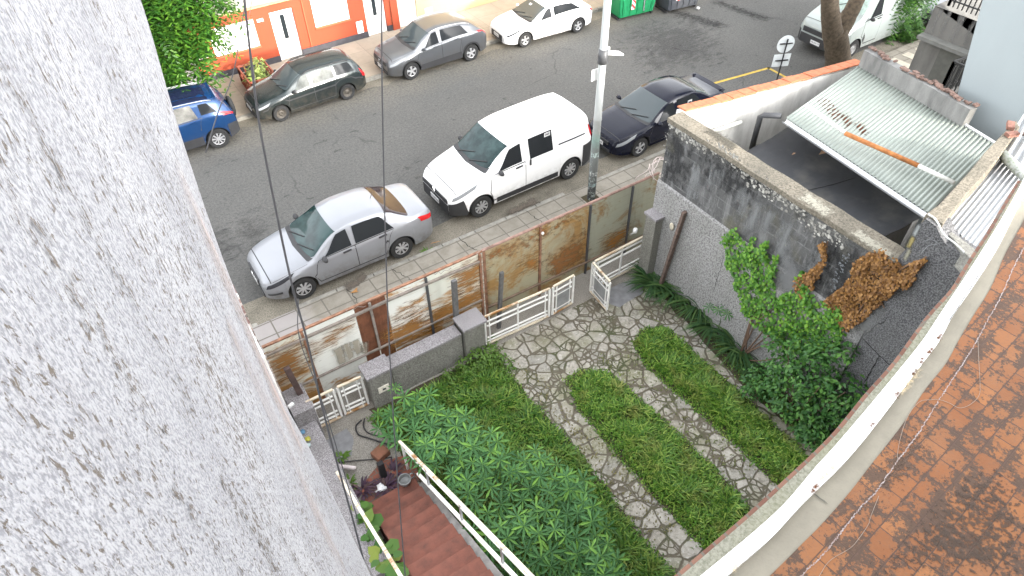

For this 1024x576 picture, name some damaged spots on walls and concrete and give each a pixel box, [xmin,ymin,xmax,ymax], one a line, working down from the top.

rust [818,97,866,135]
rust [600,223,628,251]
water stain [663,122,867,297]
rust [254,317,359,419]